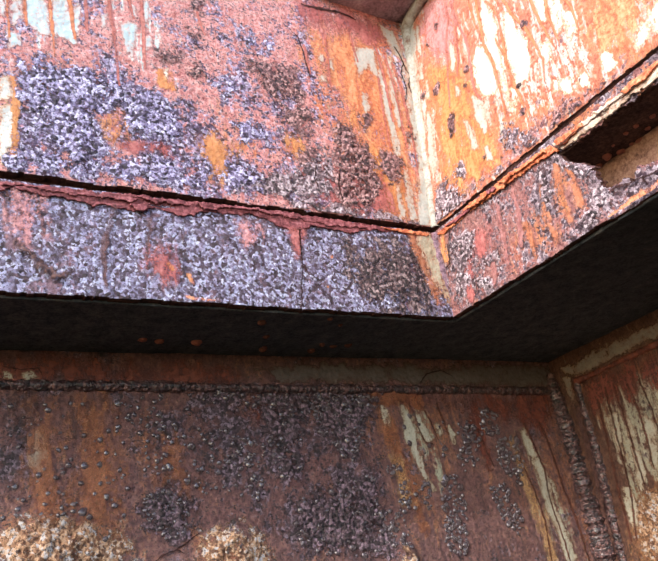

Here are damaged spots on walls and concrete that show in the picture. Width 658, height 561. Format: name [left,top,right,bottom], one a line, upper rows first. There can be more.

peeling [0,0,81,49]
rust [0,0,658,305]
crack [394,47,412,102]
peeling [462,0,531,161]
peeling [533,0,578,39]
crack [555,85,636,149]
crack [608,169,658,193]
rust [0,351,571,561]
peeling [398,402,457,492]
peeling [518,427,578,561]
rust [539,423,590,561]
peeling [608,389,658,531]